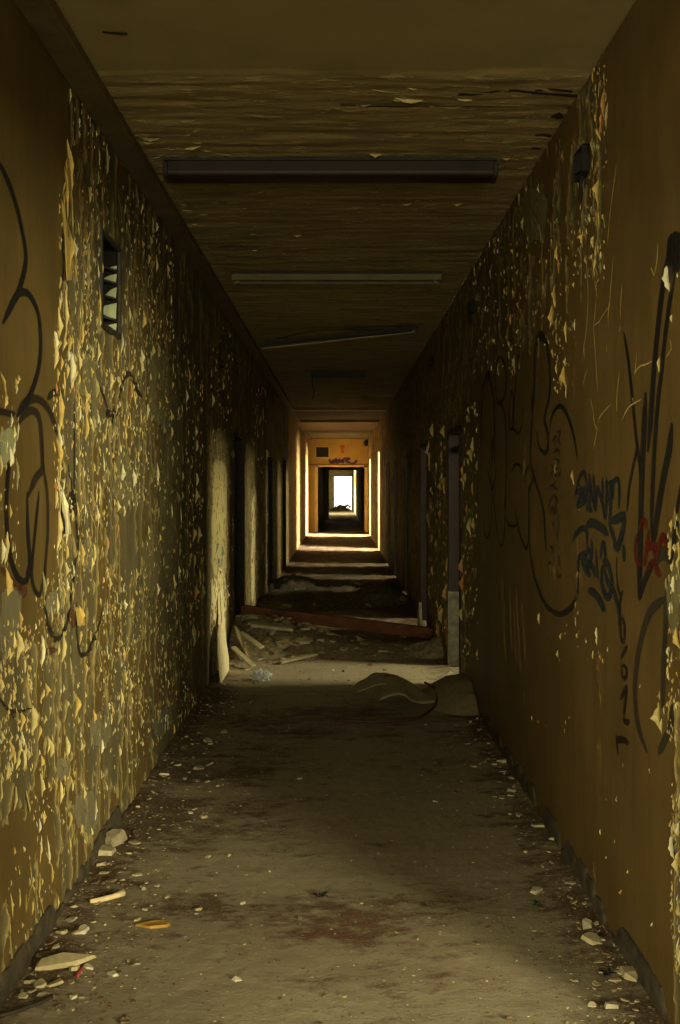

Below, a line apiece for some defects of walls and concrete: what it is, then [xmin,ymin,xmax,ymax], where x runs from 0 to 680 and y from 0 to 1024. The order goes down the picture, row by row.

peeling [356,88,433,107]
peeling [473,65,608,398]
spalling [0,89,234,940]
spalling [251,388,269,606]
peeling [425,403,478,646]
spalling [650,516,680,749]
peeling [668,782,680,982]